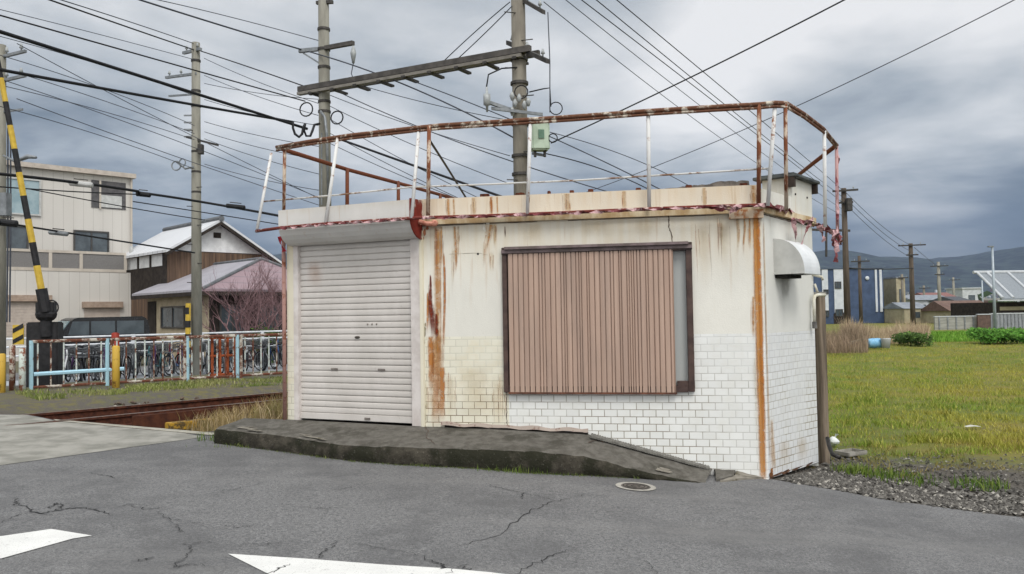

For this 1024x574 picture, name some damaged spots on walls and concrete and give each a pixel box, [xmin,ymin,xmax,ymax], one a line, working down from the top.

rust [427,227,457,407]
crack [422,220,525,228]
crack [568,215,711,242]
rust [743,218,765,474]